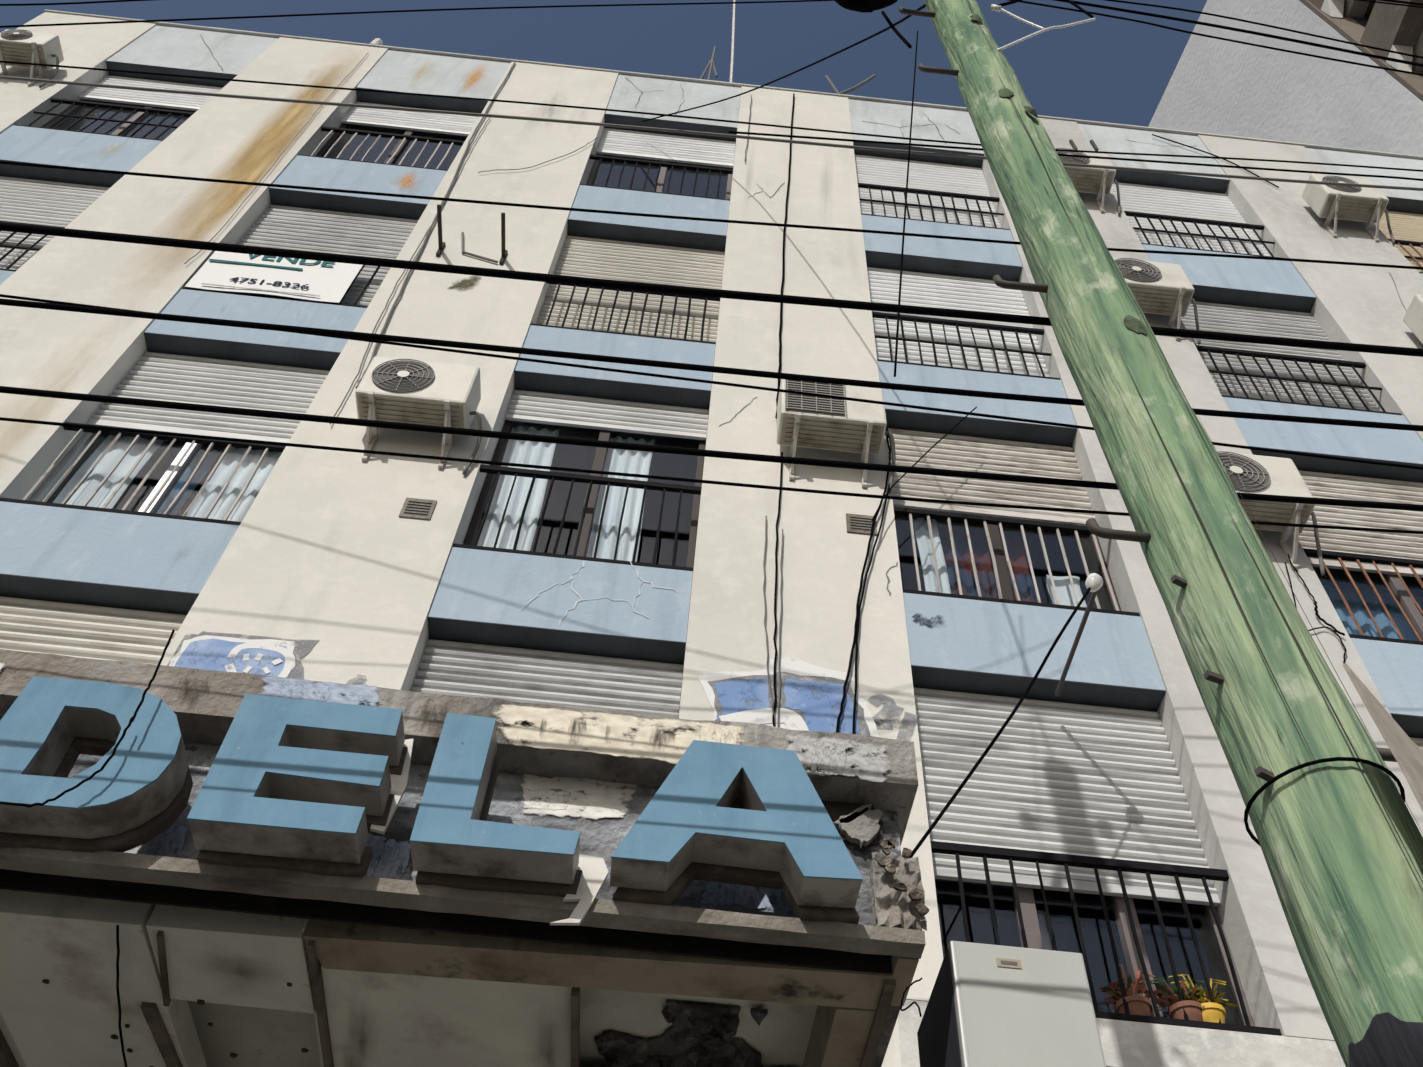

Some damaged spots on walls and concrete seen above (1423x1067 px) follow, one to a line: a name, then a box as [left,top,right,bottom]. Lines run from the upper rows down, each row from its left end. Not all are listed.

rust [196,88,327,232]
crack [520,561,678,625]
peeling [786,734,891,782]
peeling [520,774,638,819]
spalling [821,800,929,917]